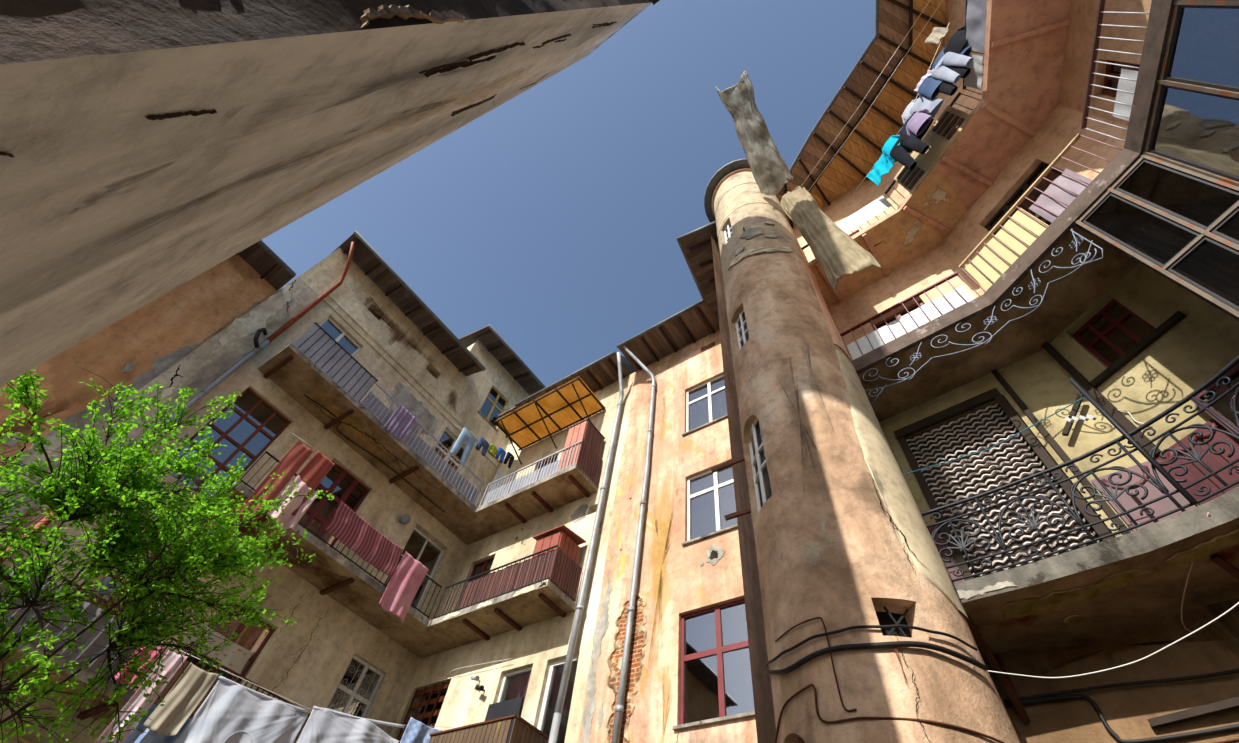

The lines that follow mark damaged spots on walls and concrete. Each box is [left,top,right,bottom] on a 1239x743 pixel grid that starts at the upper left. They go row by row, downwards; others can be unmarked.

peeling [360,4,465,28]
peeling [728,221,793,271]
crack [870,475,929,574]
flaking render [581,549,647,743]